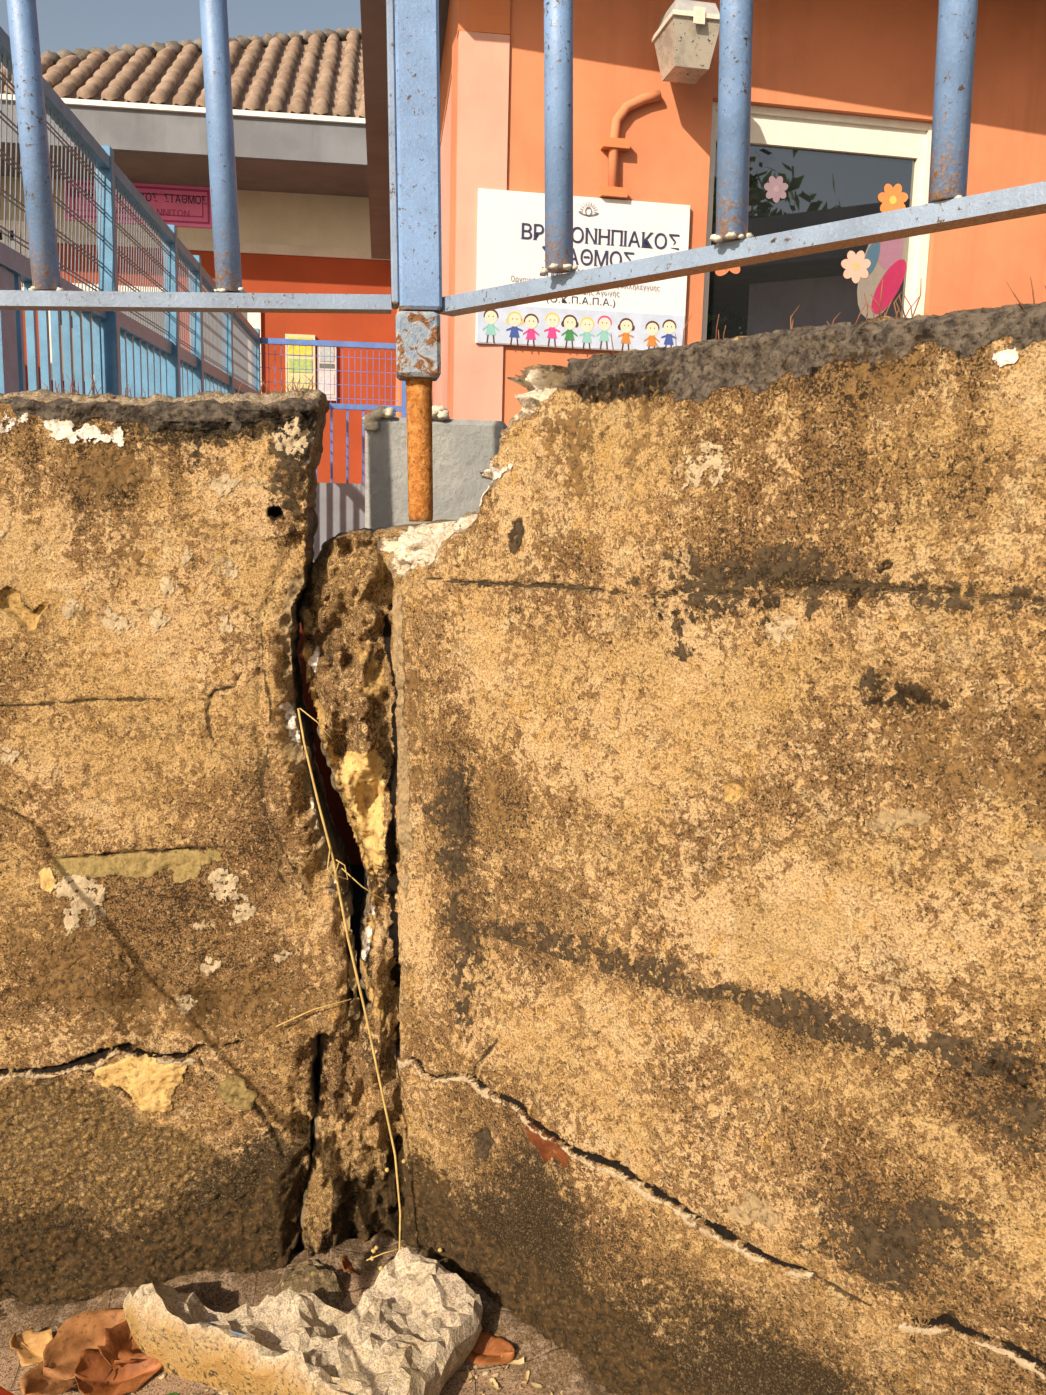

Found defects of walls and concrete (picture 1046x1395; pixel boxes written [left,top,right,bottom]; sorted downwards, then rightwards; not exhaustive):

water stain [0,396,321,578]
spalling [377,366,567,580]
crack [426,577,633,597]
crack [383,603,872,1306]
crack [0,1040,243,1099]
crack [253,1101,285,1157]
water stain [0,1151,305,1307]
water stain [330,1118,728,1395]
water stain [778,1162,1012,1312]
crack [898,1314,1046,1380]